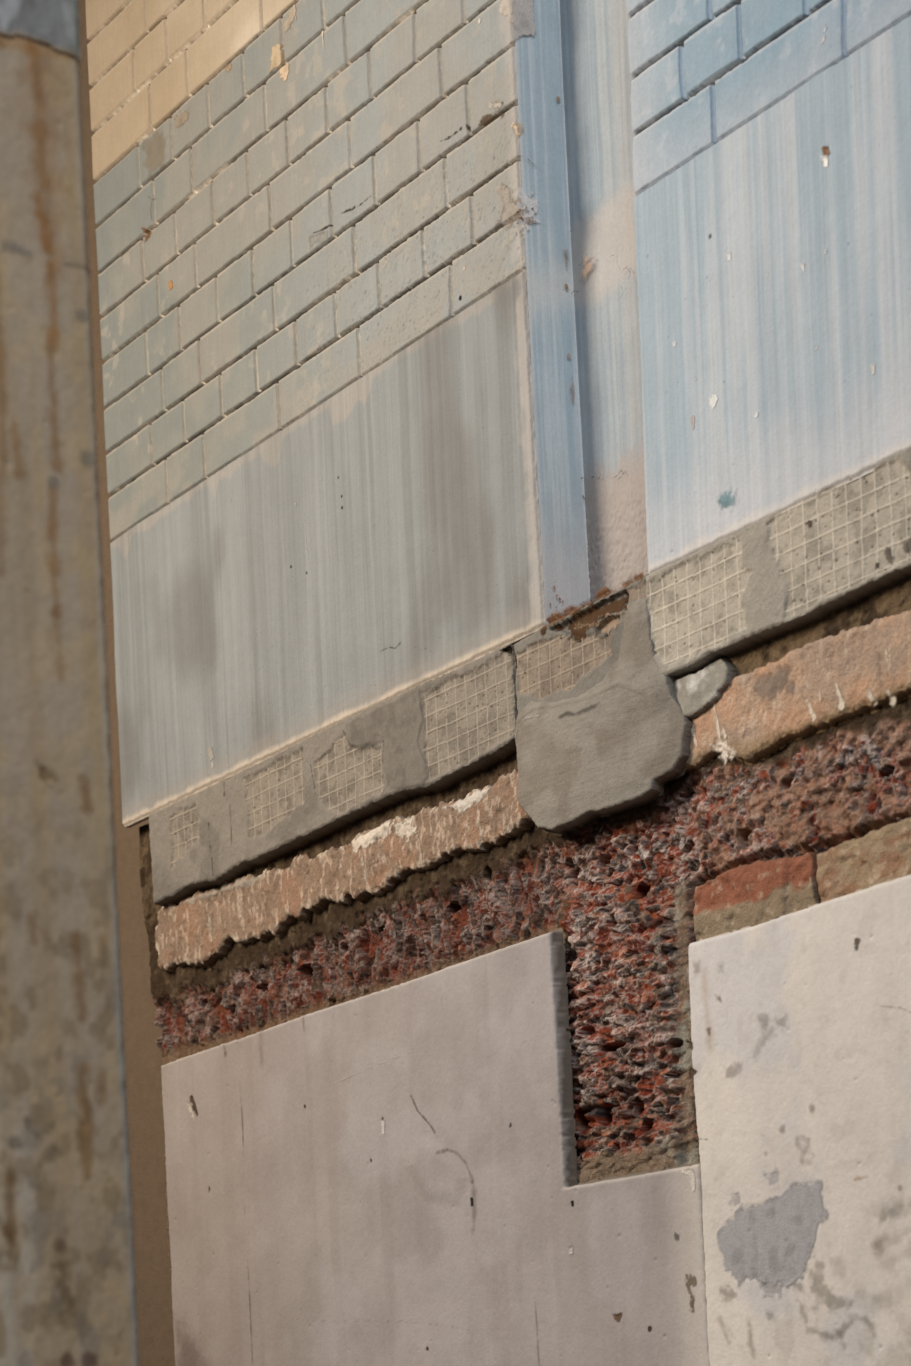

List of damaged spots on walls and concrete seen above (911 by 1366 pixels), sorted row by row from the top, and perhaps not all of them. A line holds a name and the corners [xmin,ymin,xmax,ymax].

spalling [728,577,911,676]
spalling [139,697,911,1191]